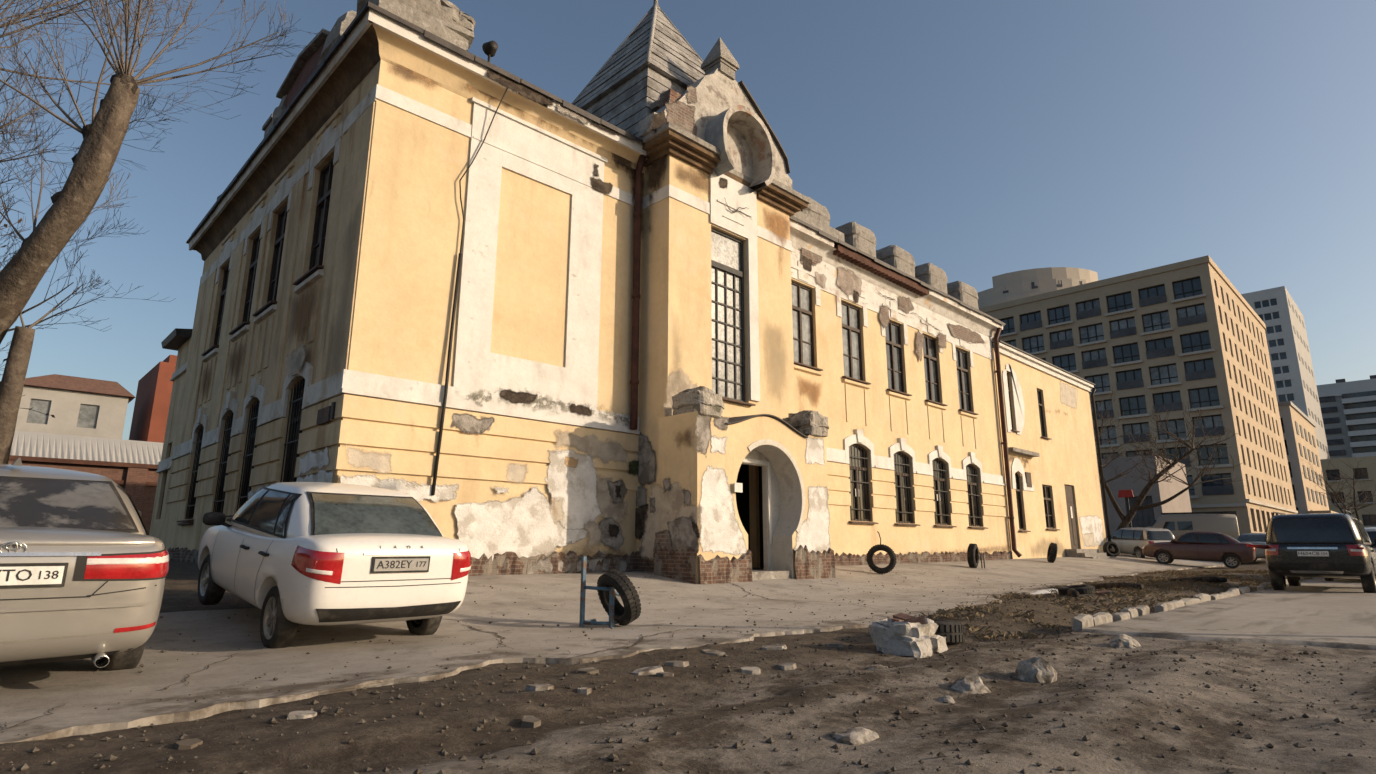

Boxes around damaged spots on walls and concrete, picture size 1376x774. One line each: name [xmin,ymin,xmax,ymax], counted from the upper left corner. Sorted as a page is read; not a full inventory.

spalling [650,86,697,136]
spalling [801,247,862,303]
spalling [879,296,914,328]
spalling [916,323,985,362]
spalling [664,369,698,417]
peeling [296,413,747,574]
peeling [793,486,830,553]
peeling [1079,515,1104,547]